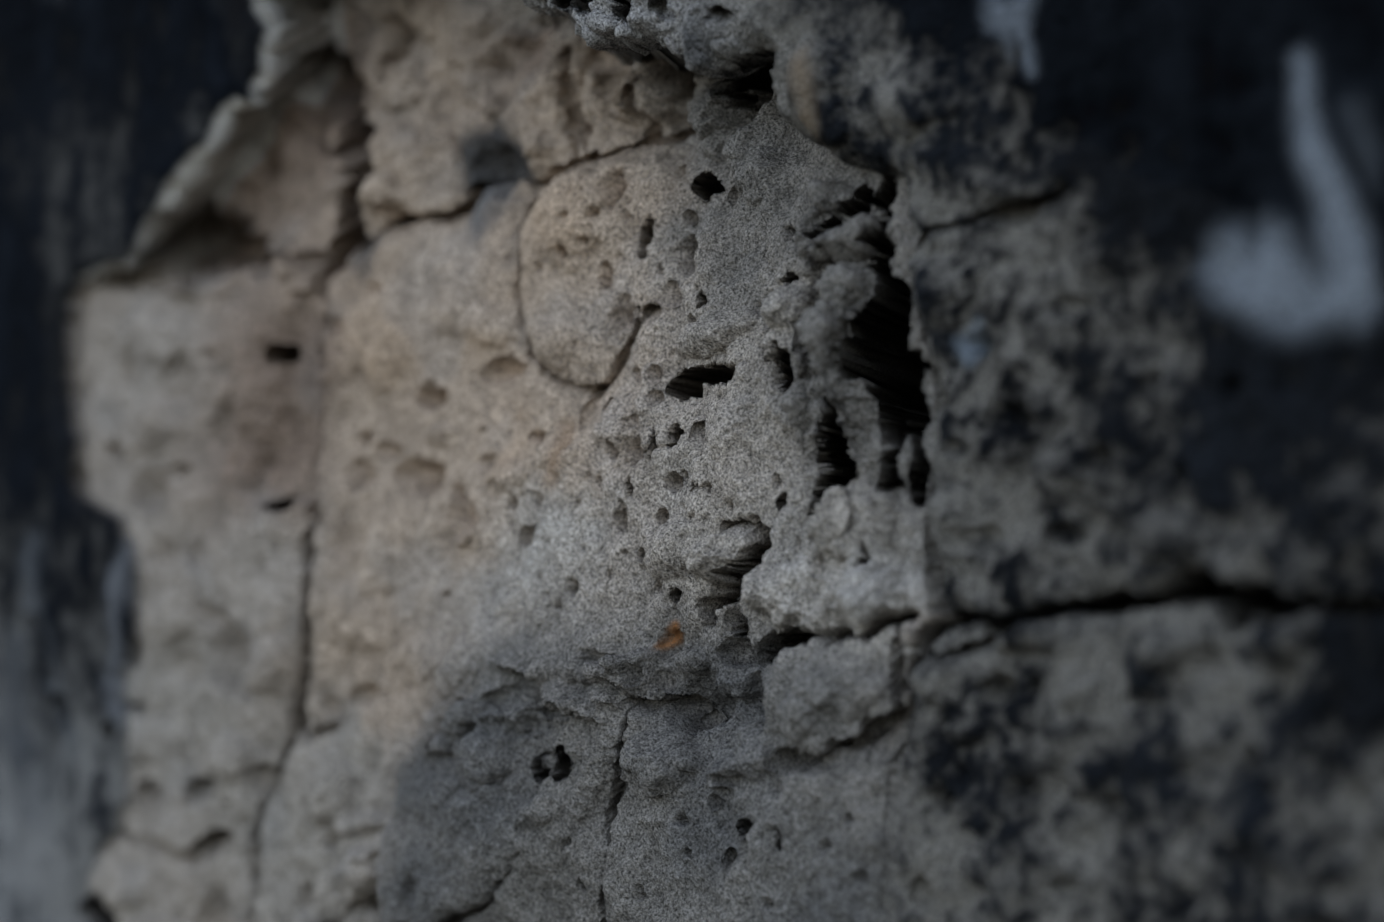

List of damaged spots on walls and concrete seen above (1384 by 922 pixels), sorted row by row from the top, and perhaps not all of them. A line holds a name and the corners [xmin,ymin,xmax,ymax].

crack [41,0,696,509]
spalling [61,0,950,922]
crack [292,714,341,746]
crack [329,891,380,922]
crack [599,692,715,922]
crack [695,518,1384,922]